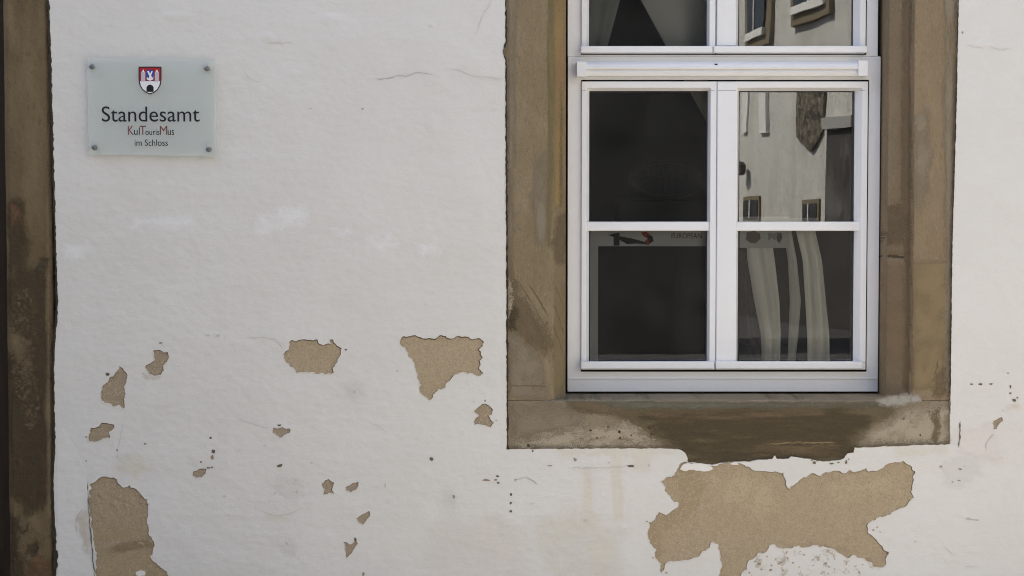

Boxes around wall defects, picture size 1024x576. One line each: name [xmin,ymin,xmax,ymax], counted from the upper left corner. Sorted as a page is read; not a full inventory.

damp [506,0,1003,561]
flaking render [100,366,127,410]
flaking render [144,342,169,377]
flaking render [283,339,347,376]
flaking render [399,335,484,402]
flaking render [85,423,118,458]
flaking render [272,424,290,438]
flaking render [473,400,497,428]
flaking render [87,476,167,576]
flaking render [646,459,915,576]